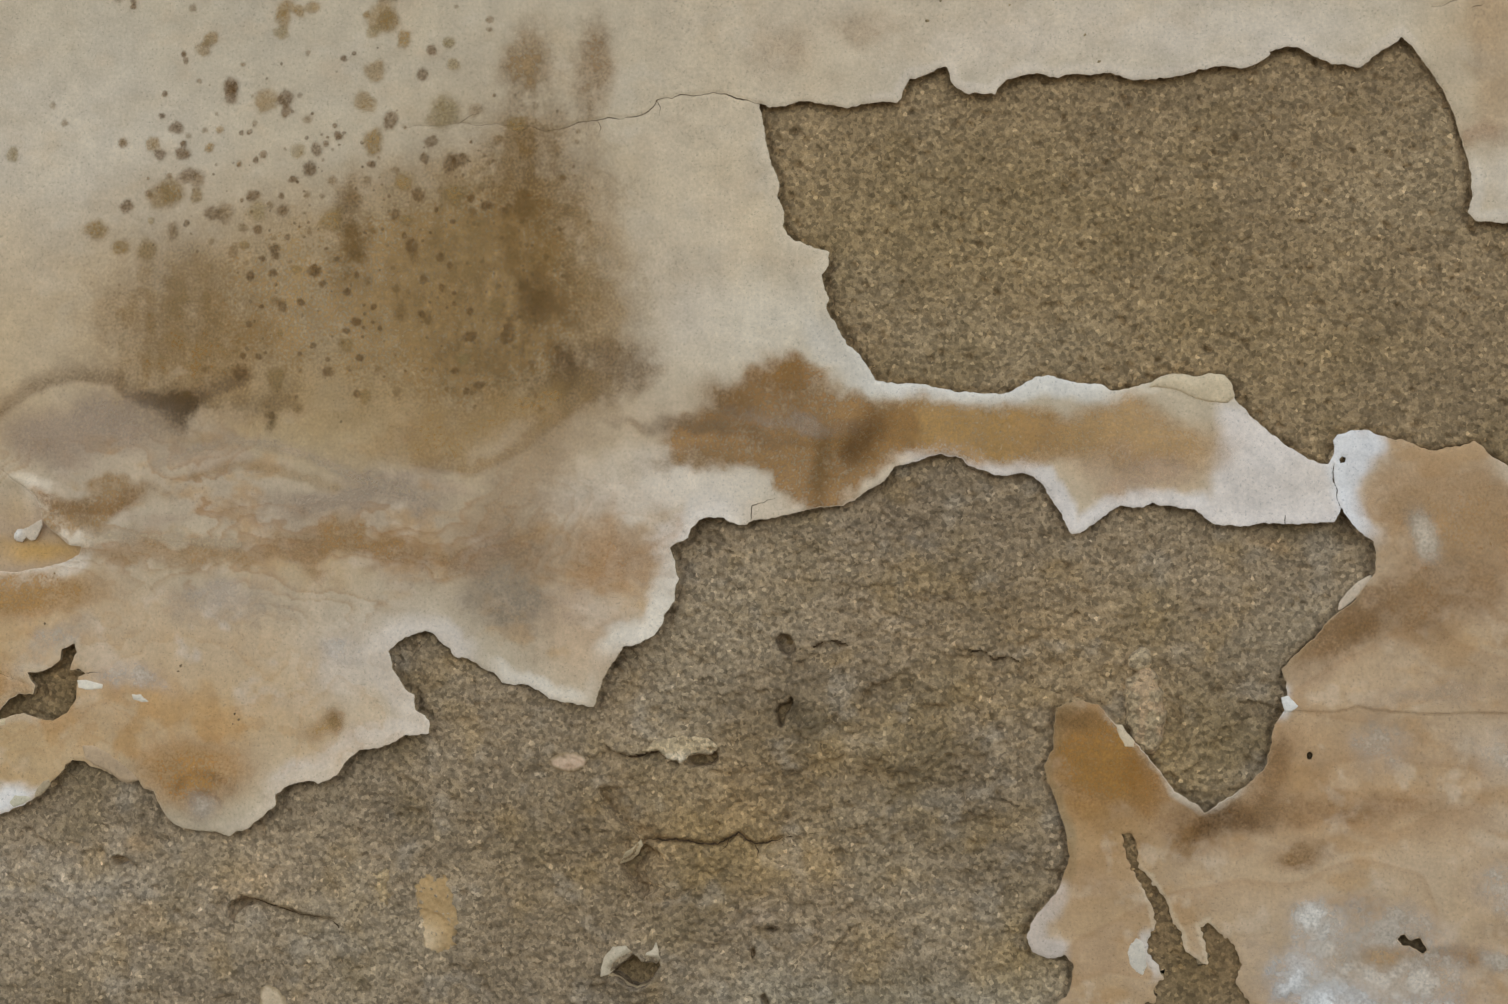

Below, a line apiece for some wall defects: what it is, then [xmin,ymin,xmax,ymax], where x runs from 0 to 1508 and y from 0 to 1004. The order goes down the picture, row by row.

water stain [25,113,643,470]
peeling [759,37,1508,465]
water stain [0,574,81,612]
water stain [34,475,257,566]
peeling [0,454,1376,1004]
water stain [1275,903,1508,1004]